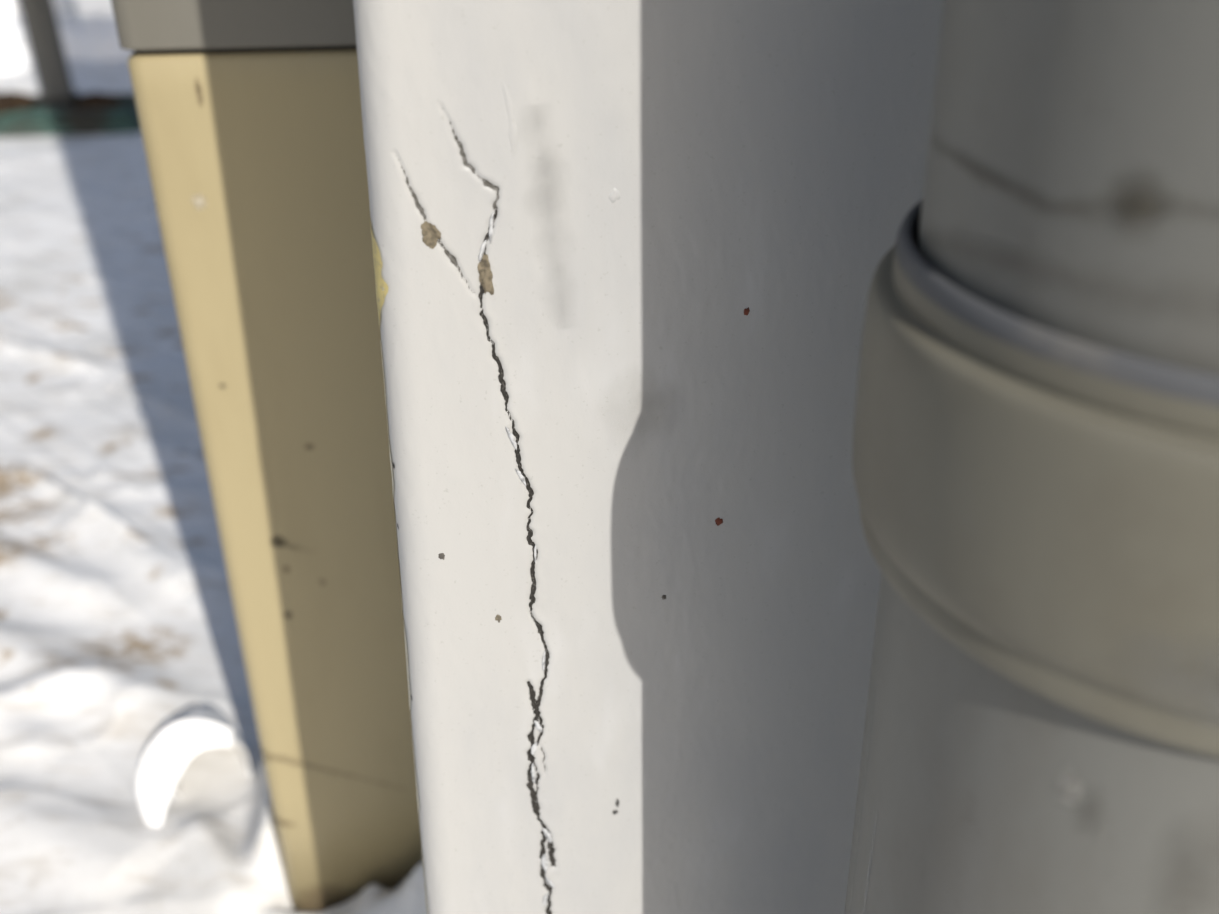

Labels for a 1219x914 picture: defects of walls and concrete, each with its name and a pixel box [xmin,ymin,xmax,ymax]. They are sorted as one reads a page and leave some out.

crack [396,108,556,914]